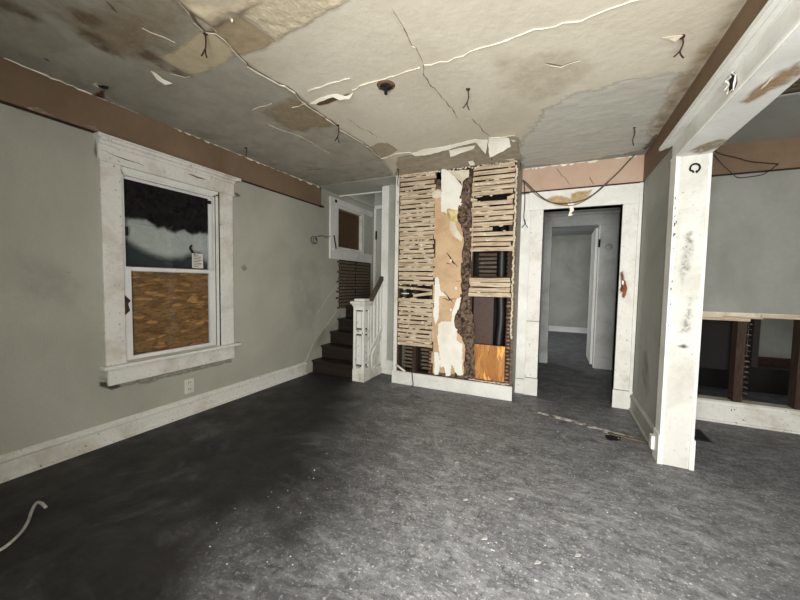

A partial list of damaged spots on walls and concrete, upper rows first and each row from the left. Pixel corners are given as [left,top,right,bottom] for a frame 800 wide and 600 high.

flaking render [160,0,347,75]
crack [177,0,411,167]
leakage [272,100,331,131]
crack [352,0,638,137]
spalling [399,135,598,379]